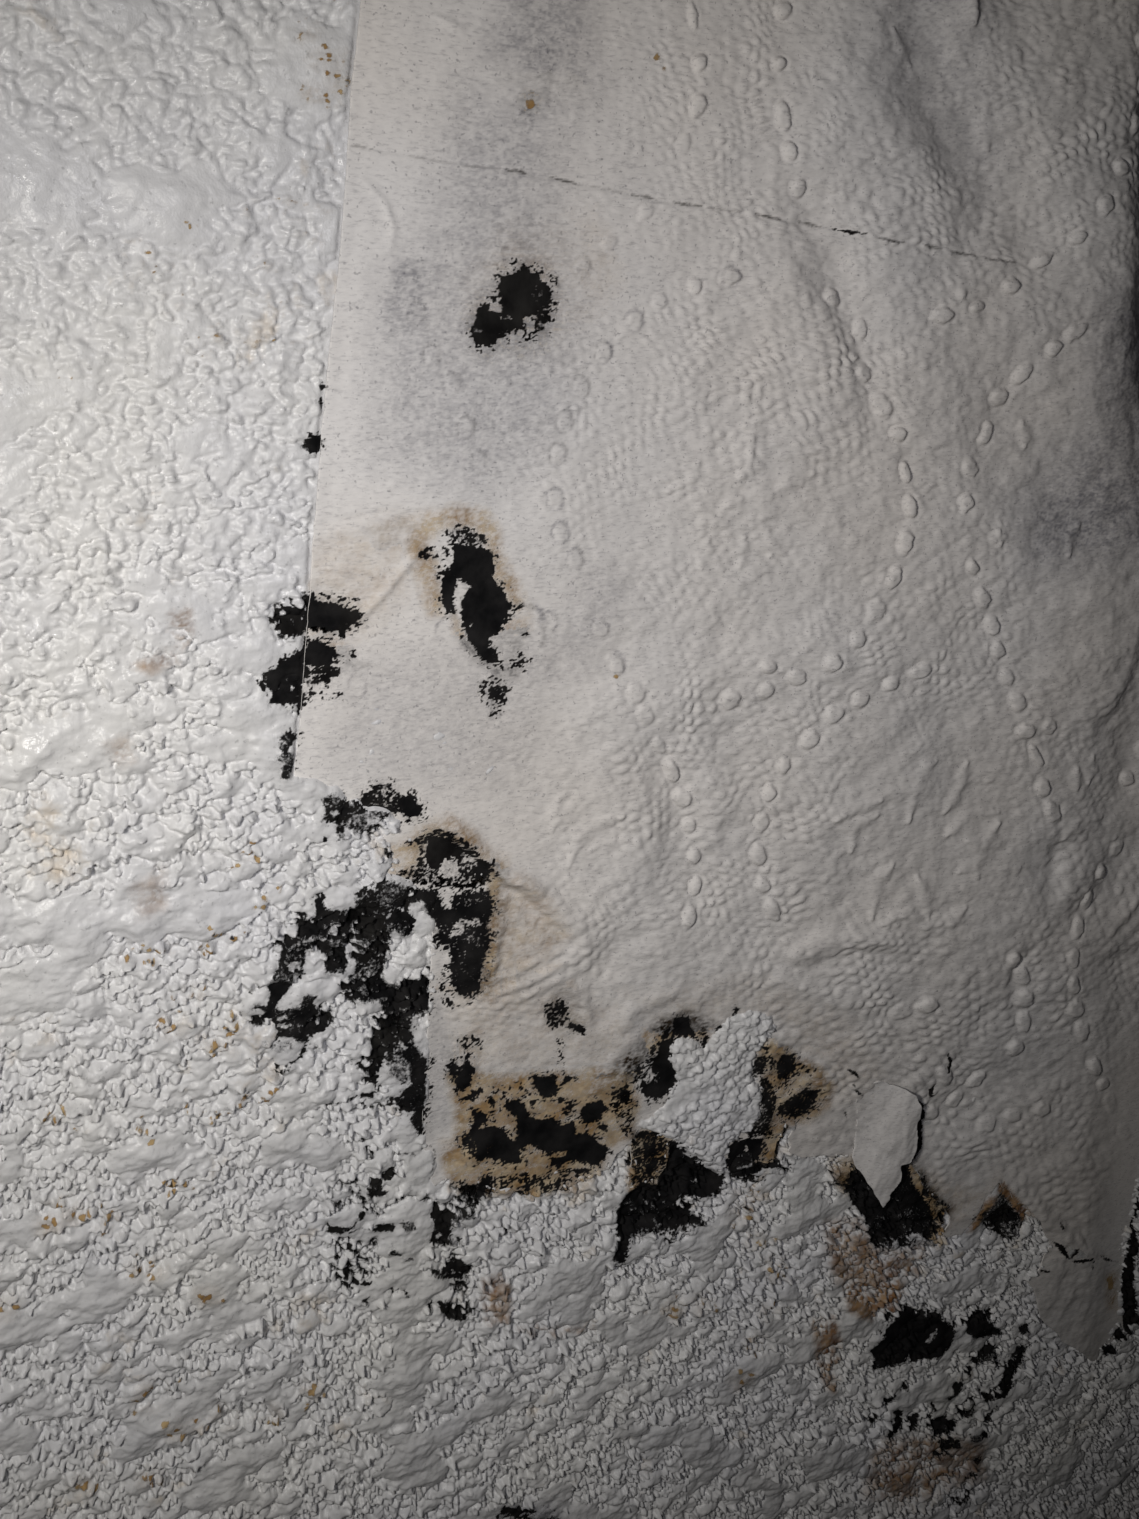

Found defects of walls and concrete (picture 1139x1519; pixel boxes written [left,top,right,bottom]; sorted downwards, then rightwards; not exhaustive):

mould [466,258,559,353]
mould [256,591,368,779]
mould [412,510,533,719]
damp [249,778,740,1321]
mould [726,1042,832,1183]
damp [813,1323,840,1392]
damp [830,1160,1030,1506]
mould [496,1505,559,1519]